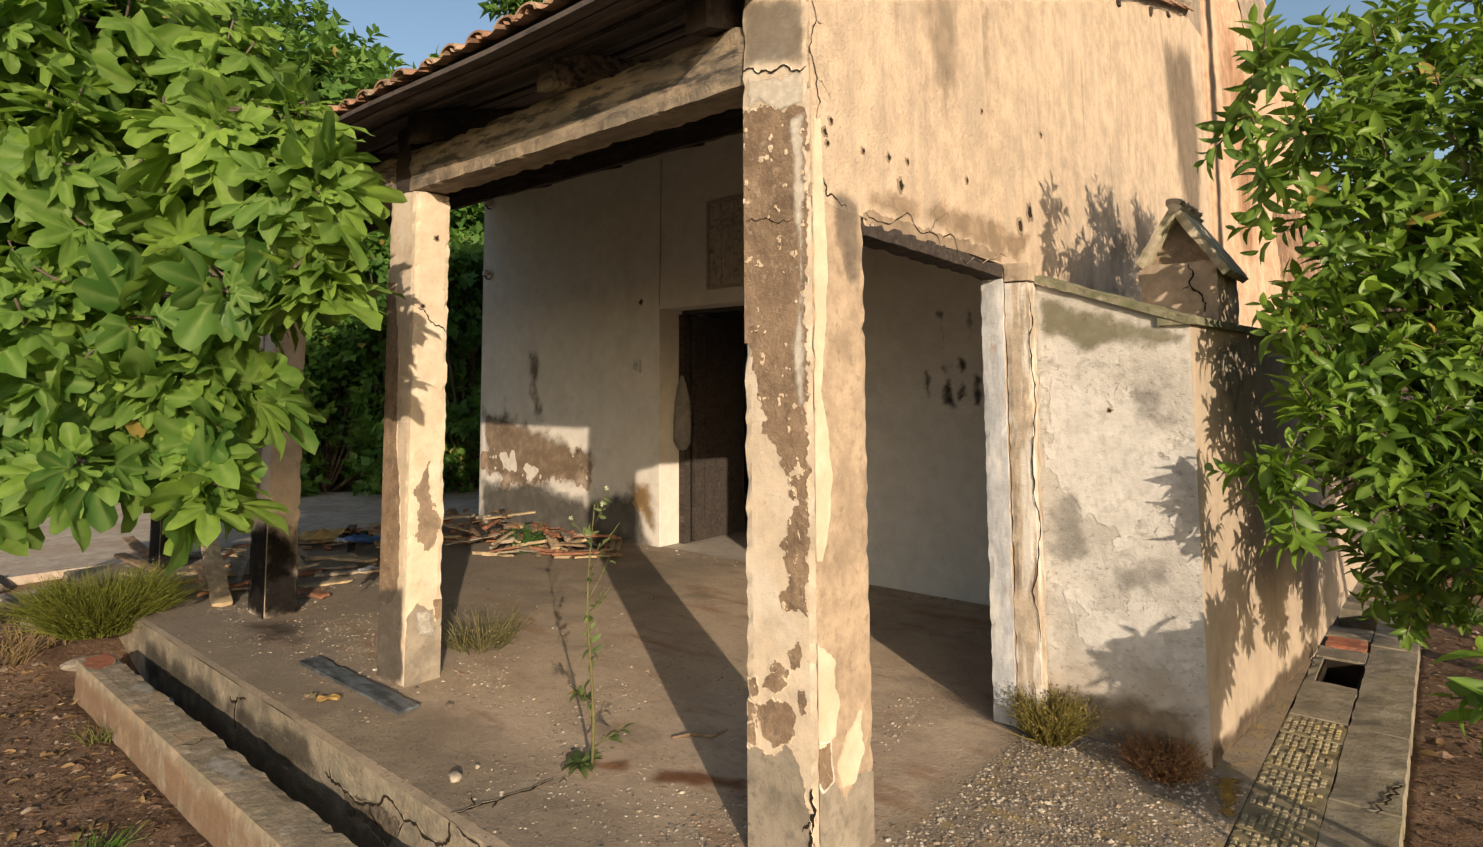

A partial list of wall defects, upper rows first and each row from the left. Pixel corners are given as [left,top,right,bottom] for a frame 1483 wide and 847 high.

crack [742,0,831,118]
crack [823,178,1007,265]
crack [1183,264,1207,312]
peeling [379,281,442,594]
peeling [480,446,594,491]
peeling [1040,374,1189,552]
peeling [1049,563,1196,671]
crack [324,766,554,847]
peeling [747,642,875,847]
crack [1374,783,1406,814]